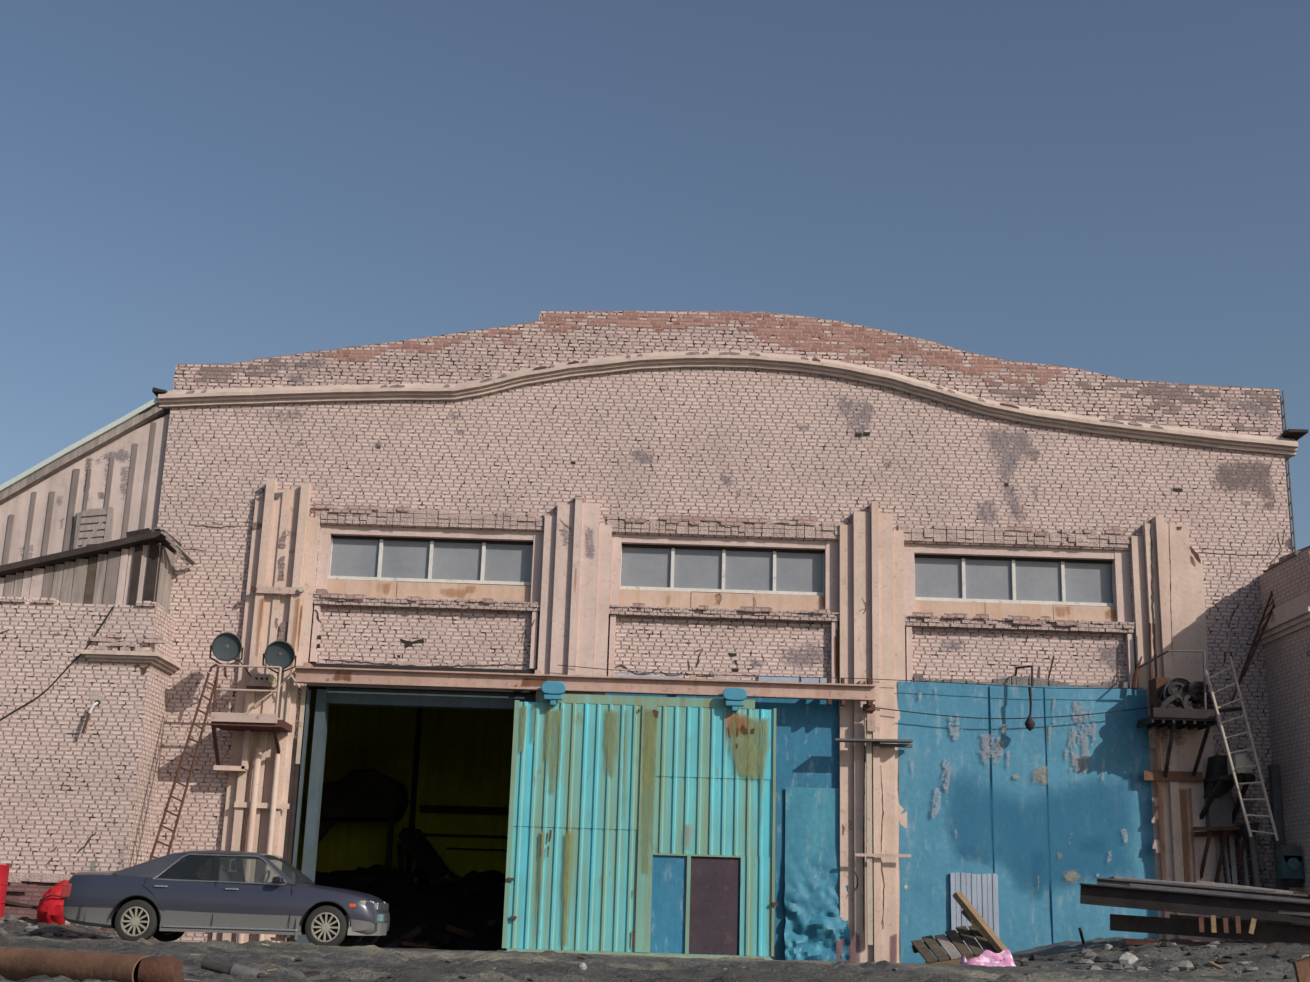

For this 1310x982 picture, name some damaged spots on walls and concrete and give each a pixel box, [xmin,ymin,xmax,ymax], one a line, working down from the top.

peeling [186,358,308,393]
peeling [323,329,521,362]
peeling [539,311,1221,428]
damp [977,430,1037,525]
damp [1214,460,1274,508]
corrosion [520,706,561,791]
corrosion [605,710,628,796]
corrosion [643,710,655,873]
corrosion [726,713,769,797]
peeling [978,724,1047,783]
peeling [1064,701,1105,780]
corrosion [563,833,573,945]